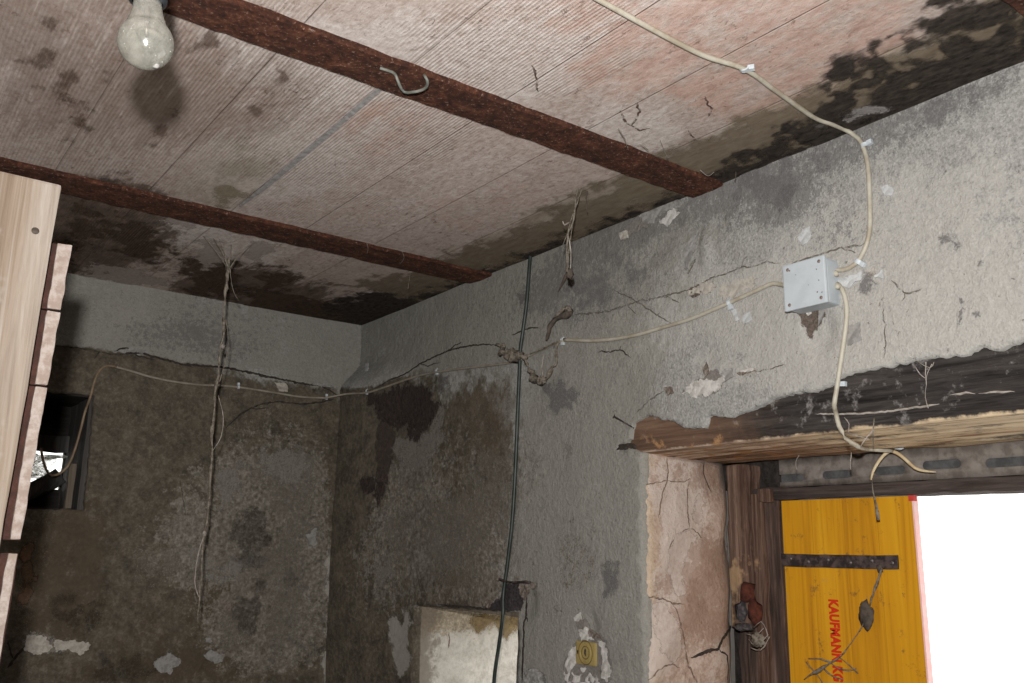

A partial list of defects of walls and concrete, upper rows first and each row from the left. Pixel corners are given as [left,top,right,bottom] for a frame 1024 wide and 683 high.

crack [620,105,650,131]
damp [654,0,1024,183]
damp [58,200,465,325]
damp [436,175,687,273]
crack [576,244,862,323]
flaking render [797,309,826,339]
flaking render [664,362,757,399]
damp [359,376,449,505]
crack [646,458,711,549]
flaking render [22,631,91,655]
flaking render [563,612,612,683]
crack [648,596,731,682]